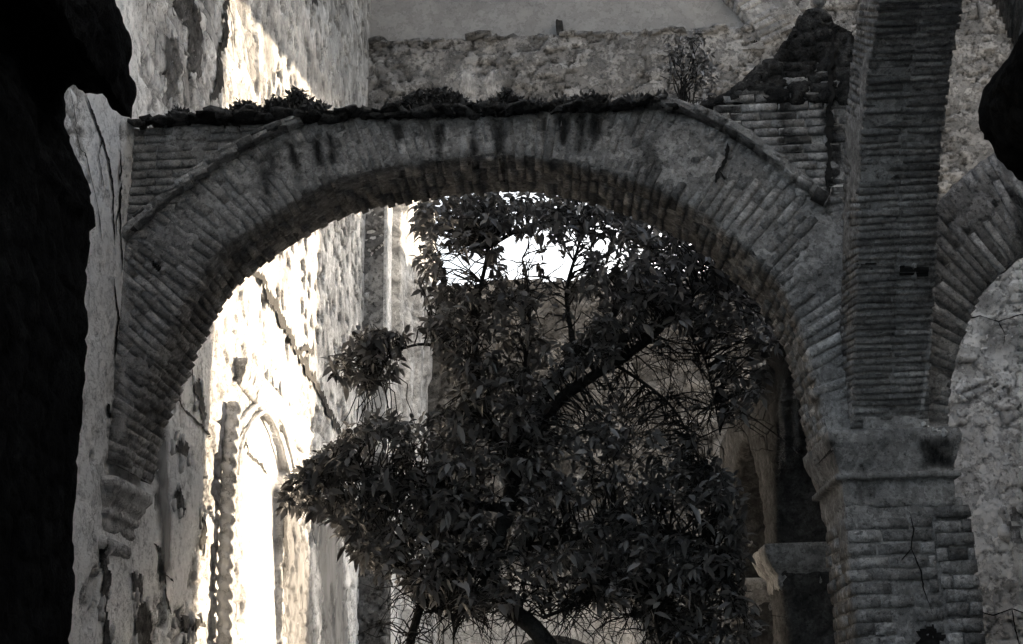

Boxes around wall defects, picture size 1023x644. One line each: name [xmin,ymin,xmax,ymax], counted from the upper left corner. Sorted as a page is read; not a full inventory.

crack [211,0,236,103]
crack [253,271,341,434]
flaking render [170,430,192,519]
spalling [89,536,116,644]
spalling [131,569,154,644]
spalling [171,604,207,644]
flaking render [199,504,209,557]
crack [902,512,932,611]